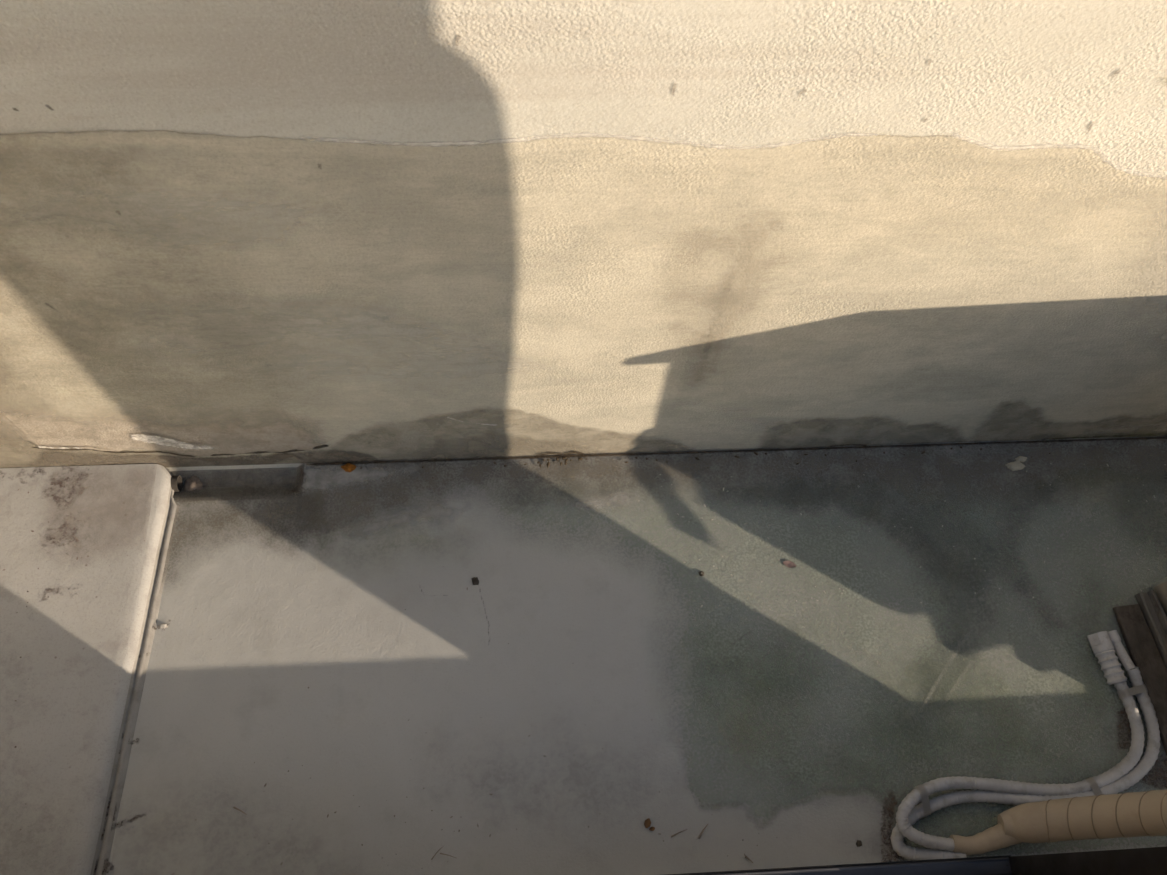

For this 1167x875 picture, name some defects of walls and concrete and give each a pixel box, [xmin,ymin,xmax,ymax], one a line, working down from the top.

peeling [0,412,378,468]
damp [0,130,1167,574]